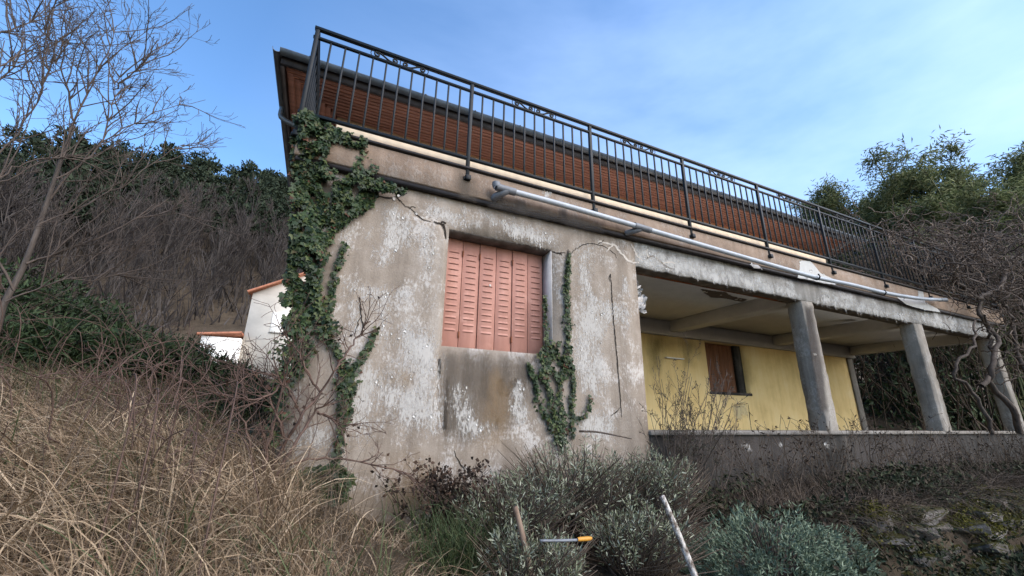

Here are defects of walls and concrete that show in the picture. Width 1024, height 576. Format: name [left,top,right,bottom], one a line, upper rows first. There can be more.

crack [380,193,447,239]
crack [551,240,675,416]
leakage [451,359,527,432]